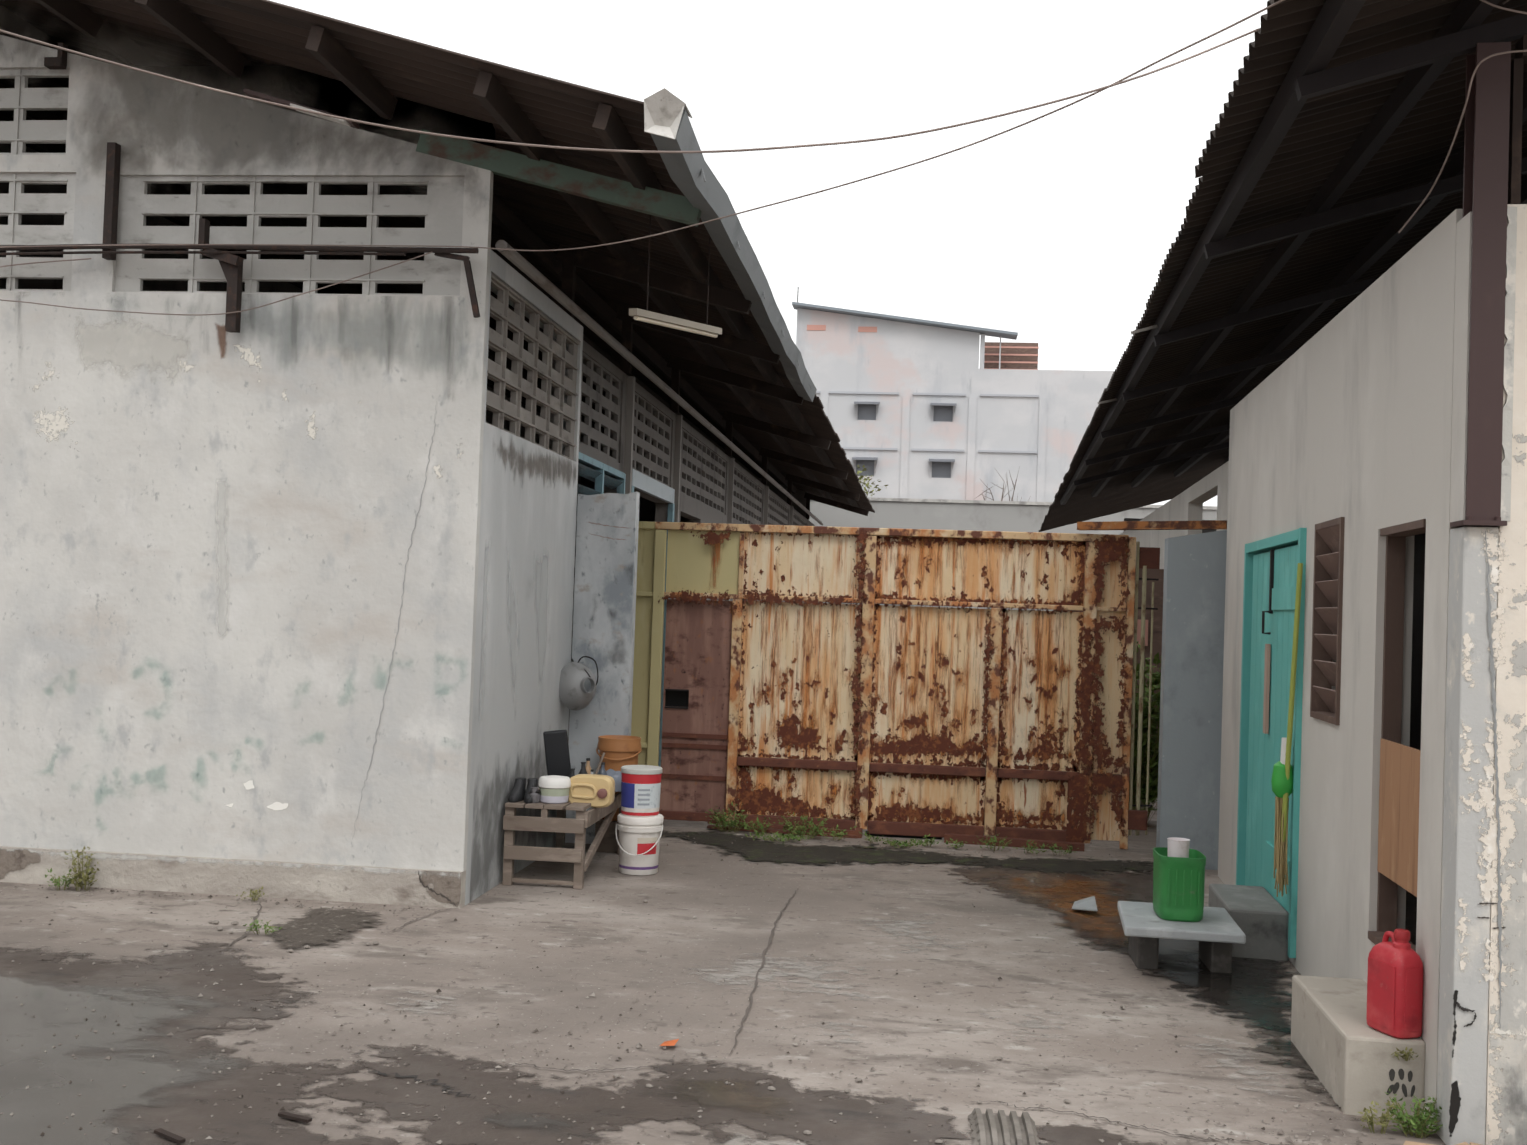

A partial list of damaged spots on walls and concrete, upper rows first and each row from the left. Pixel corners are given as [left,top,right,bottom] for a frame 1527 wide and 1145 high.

peeling [1512,434,1527,464]
crack [352,401,437,839]
rust [658,529,1131,844]
peeling [1461,529,1527,688]
peeling [1456,714,1527,1145]
damp [0,942,967,1145]
spalling [1449,1081,1461,1137]